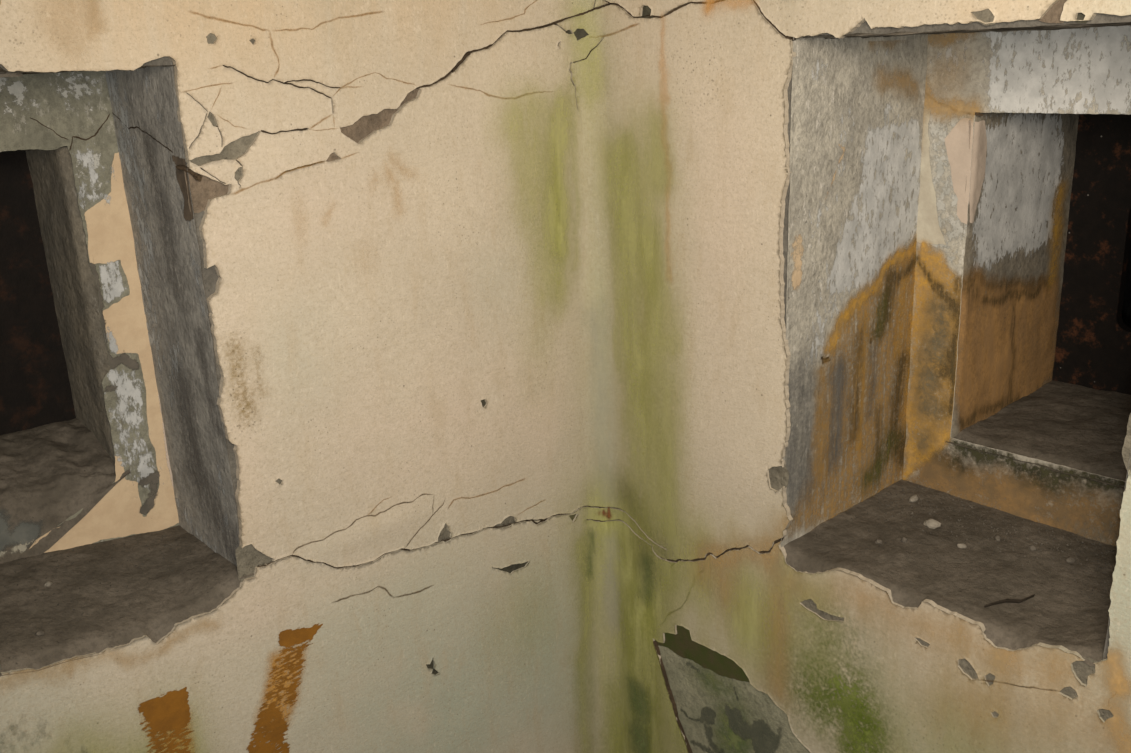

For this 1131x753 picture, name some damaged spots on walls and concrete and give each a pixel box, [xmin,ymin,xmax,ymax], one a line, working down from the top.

crack [753,0,798,41]
crack [31,0,725,193]
peeling [0,67,273,582]
spalling [1122,413,1131,471]
crack [257,480,622,602]
crack [649,537,784,625]
peeling [653,625,810,753]